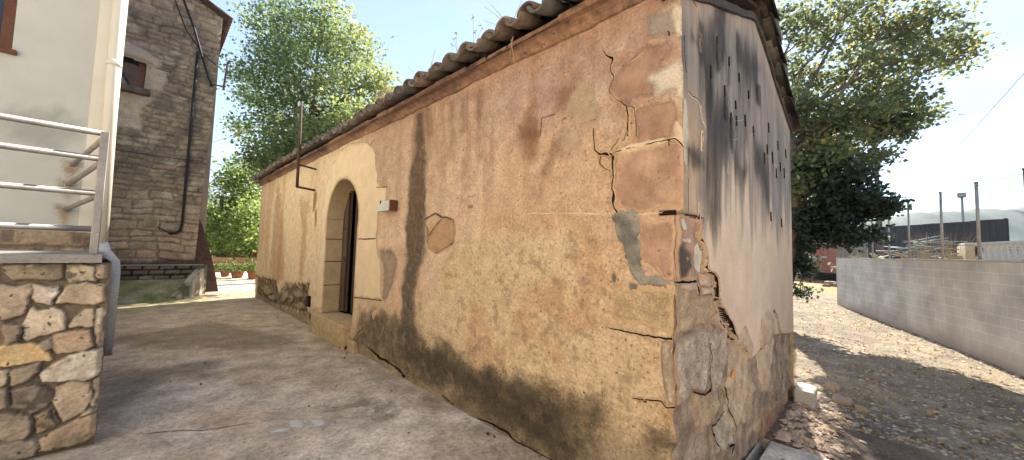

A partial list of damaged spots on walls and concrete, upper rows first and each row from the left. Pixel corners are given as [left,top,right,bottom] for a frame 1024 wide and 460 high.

flaking render [254,274,311,320]
flaking render [424,212,455,254]
leakage [355,113,605,460]
crack [540,0,782,455]
flaking render [672,210,797,460]